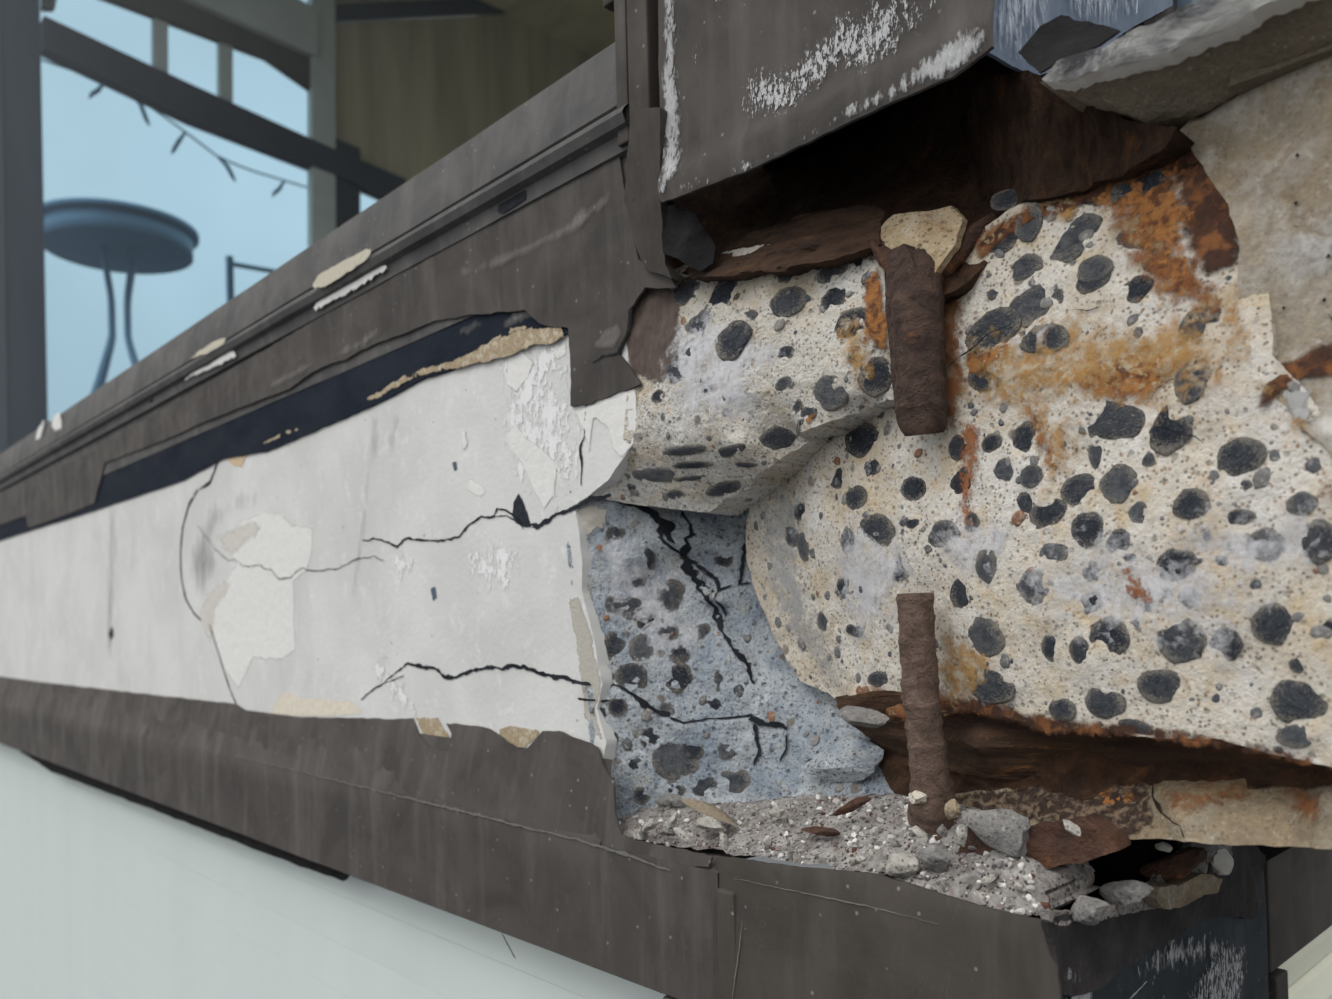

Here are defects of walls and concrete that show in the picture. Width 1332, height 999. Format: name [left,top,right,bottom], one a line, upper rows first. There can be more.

rust [944,70,1251,526]
rust [1258,343,1332,407]
peeling [200,512,313,688]
crack [180,405,788,766]
spalling [367,169,1332,836]
peeling [271,692,362,717]
spalling [1120,778,1332,849]